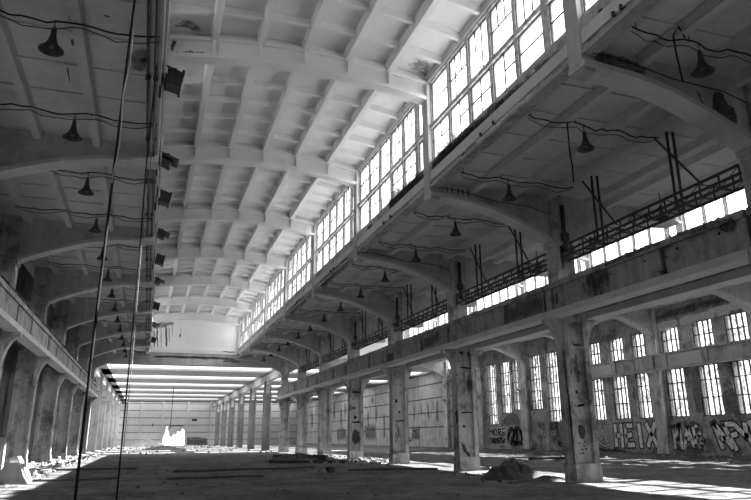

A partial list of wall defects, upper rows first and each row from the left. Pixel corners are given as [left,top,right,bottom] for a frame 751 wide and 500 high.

spalling [713,92,737,124]